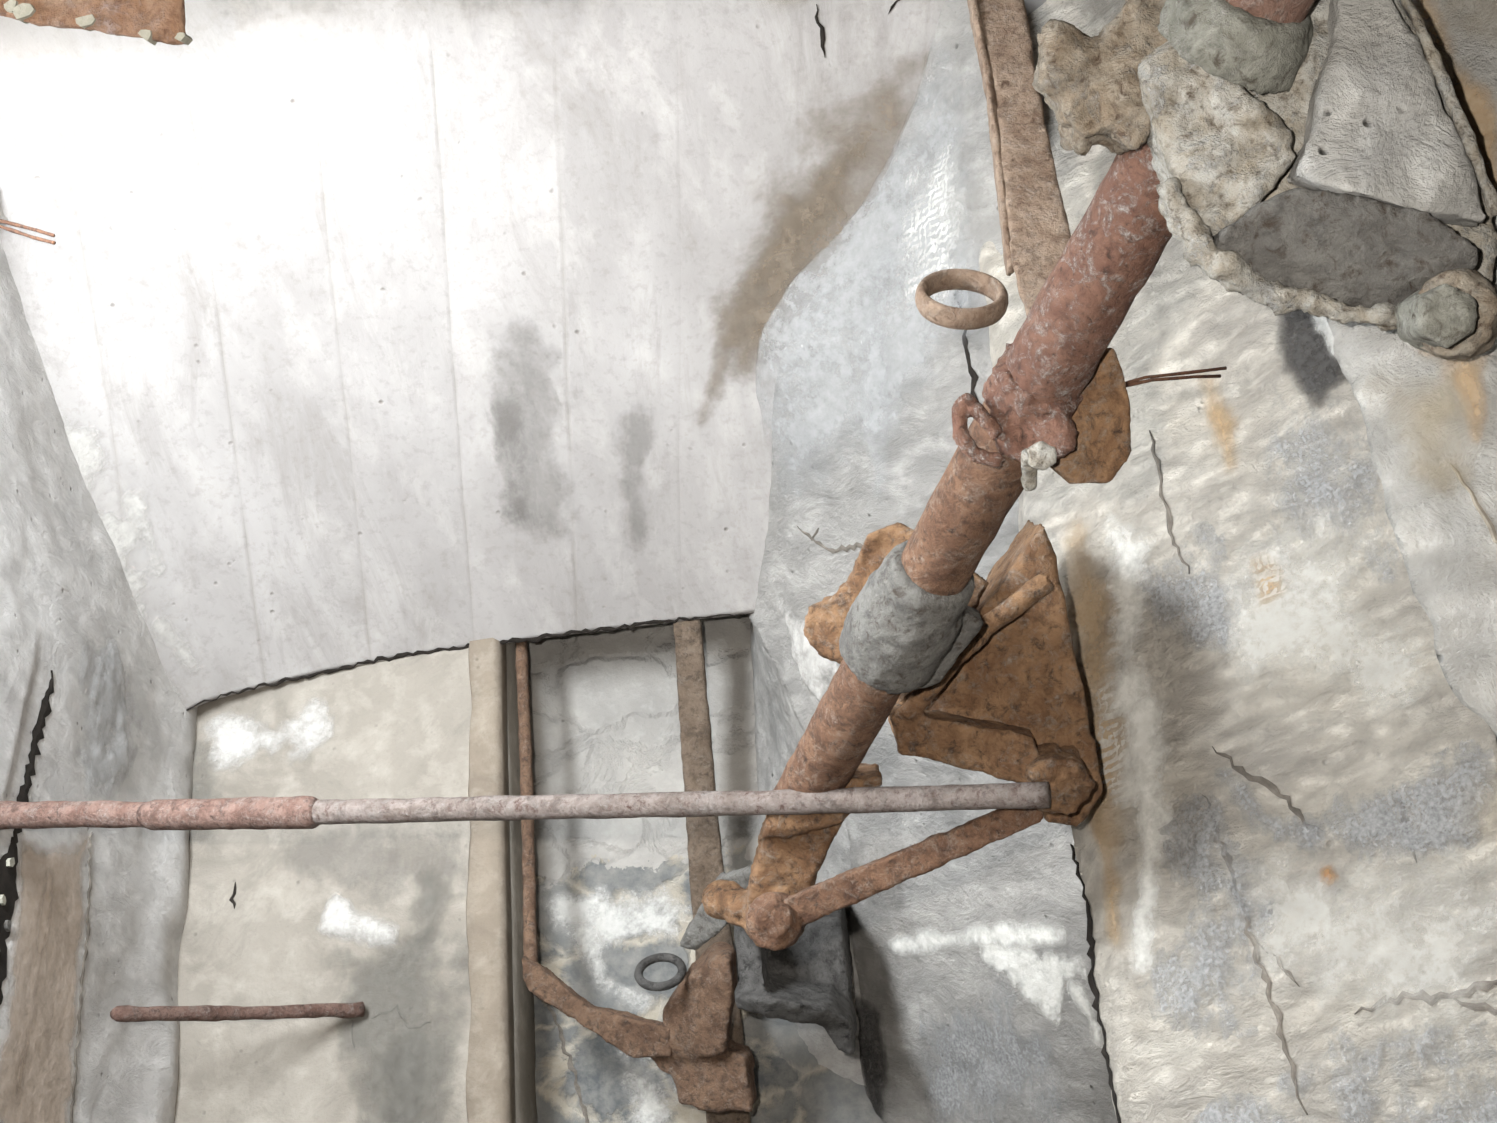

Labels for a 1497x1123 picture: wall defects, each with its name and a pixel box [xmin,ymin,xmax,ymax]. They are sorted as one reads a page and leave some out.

peeling [4,0,36,24]
peeling [75,14,96,31]
peeling [138,29,157,45]
peeling [175,32,193,45]
crack [815,4,825,57]
damp [712,88,967,469]
crack [953,290,978,419]
crack [1149,430,1190,574]
crack [186,614,745,711]
crack [0,670,54,1005]
crack [1212,746,1324,832]
crack [1200,793,1308,1115]